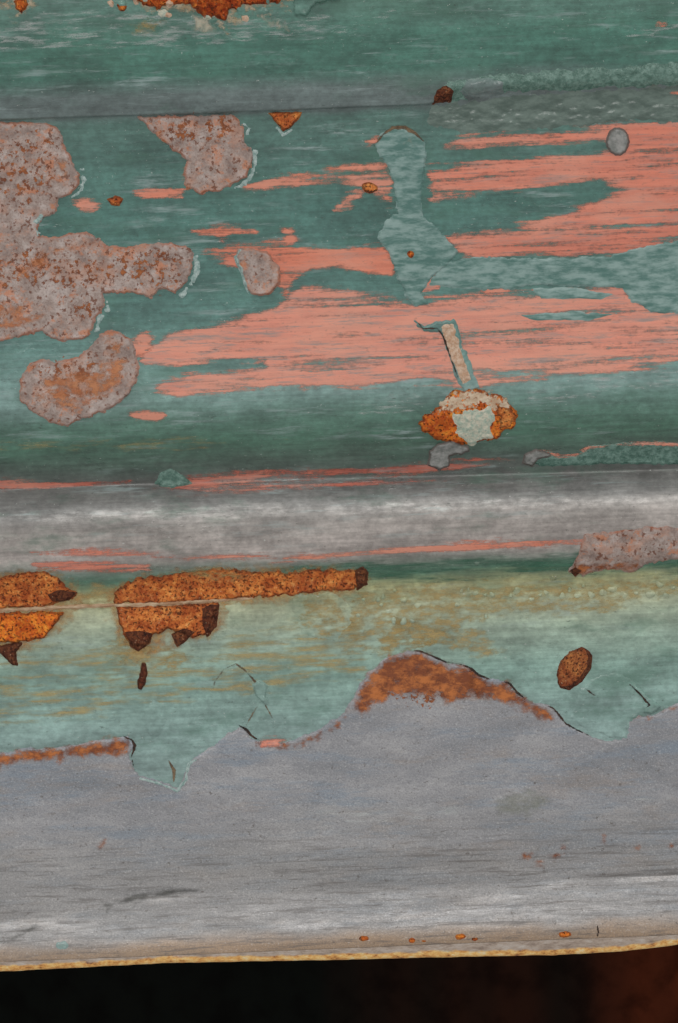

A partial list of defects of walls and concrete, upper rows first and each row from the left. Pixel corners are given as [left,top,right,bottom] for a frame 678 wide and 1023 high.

corrosion [0,0,35,17]
corrosion [107,0,337,34]
peeling [73,199,100,212]
peeling [132,122,678,397]
peeling [129,410,167,421]
corrosion [418,388,518,446]
corrosion [0,566,678,735]
corrosion [239,725,286,748]
peeling [0,650,678,962]